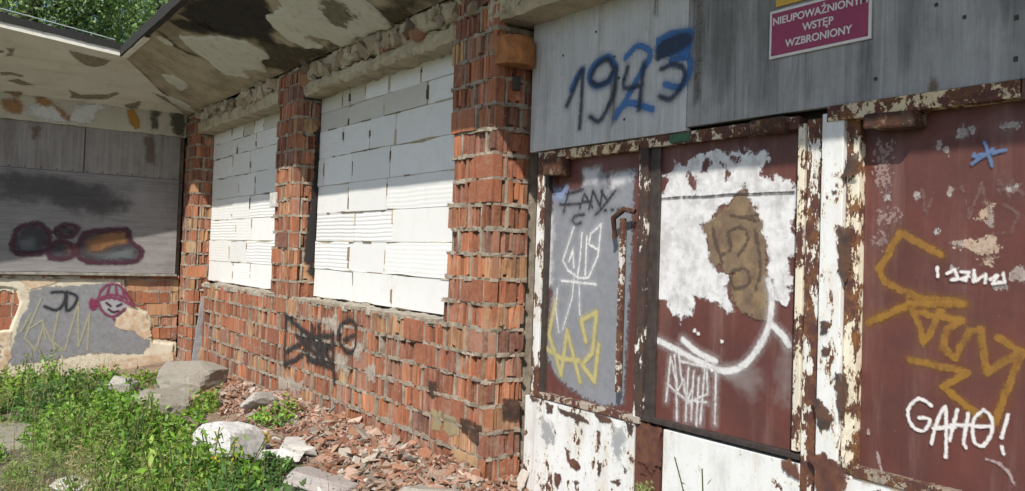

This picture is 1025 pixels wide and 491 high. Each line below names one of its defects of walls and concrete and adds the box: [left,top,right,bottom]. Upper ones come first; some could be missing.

peeling [156,35,278,120]
water stain [170,0,333,72]
peeling [266,0,478,86]
water stain [150,110,186,136]
peeling [0,275,176,378]